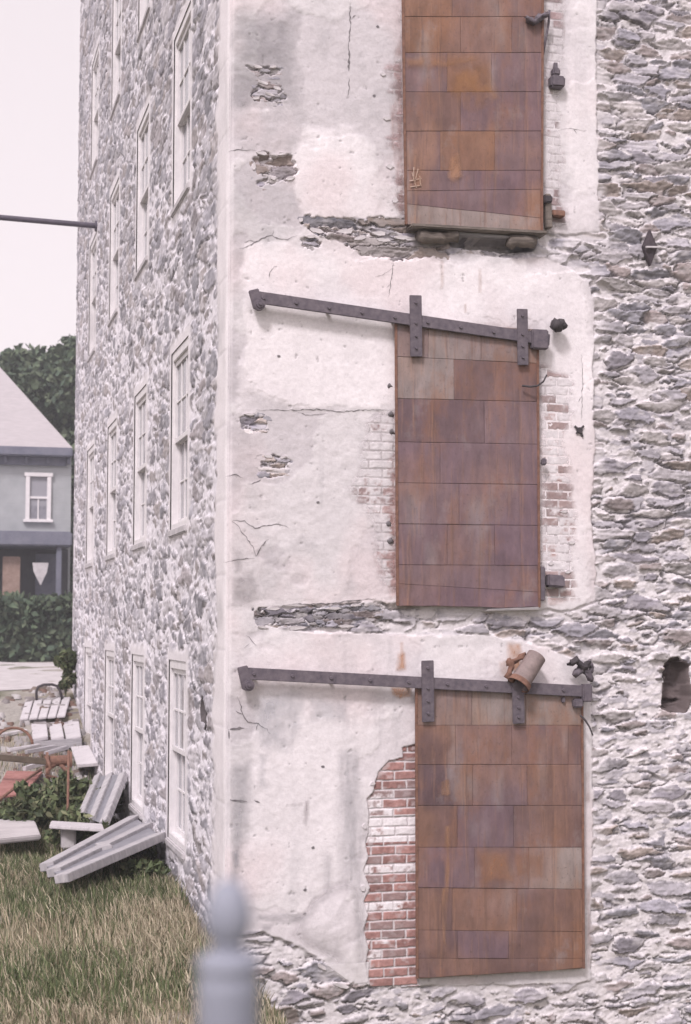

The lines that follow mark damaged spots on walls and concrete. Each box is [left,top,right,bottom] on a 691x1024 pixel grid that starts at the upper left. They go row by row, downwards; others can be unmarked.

crack [347,9,355,94]
spalling [246,64,287,107]
spalling [249,151,298,190]
spalling [297,180,450,262]
spalling [240,412,272,434]
spalling [255,454,293,478]
peeling [352,411,396,589]
crack [225,520,287,563]
spalling [252,602,383,630]
crack [228,696,268,737]
peeling [360,744,419,986]